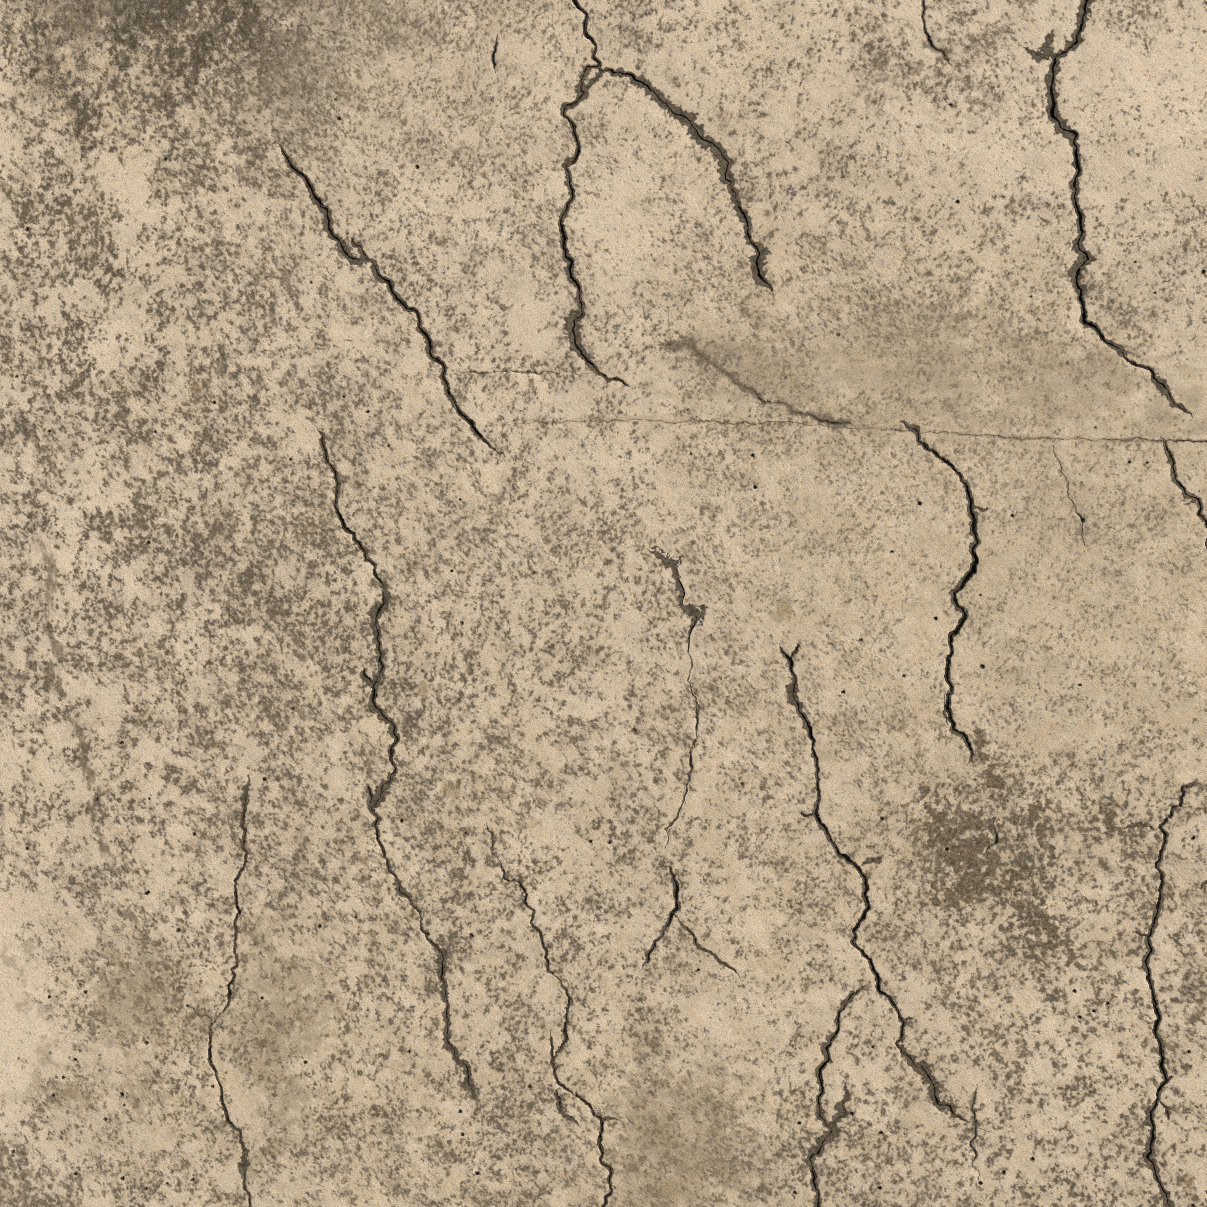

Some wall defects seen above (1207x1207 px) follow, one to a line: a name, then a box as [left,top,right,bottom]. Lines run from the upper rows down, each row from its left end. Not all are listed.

crack [191,774,251,1207]
crack [280,145,505,456]
crack [318,430,476,1099]
crack [487,826,618,1207]
crack [558,0,773,386]
crack [642,545,741,979]
crack [659,339,849,426]
crack [780,645,990,1207]
crack [900,420,987,763]
crack [1026,0,1193,417]
crack [1125,782,1195,1207]
crack [1161,437,1207,547]